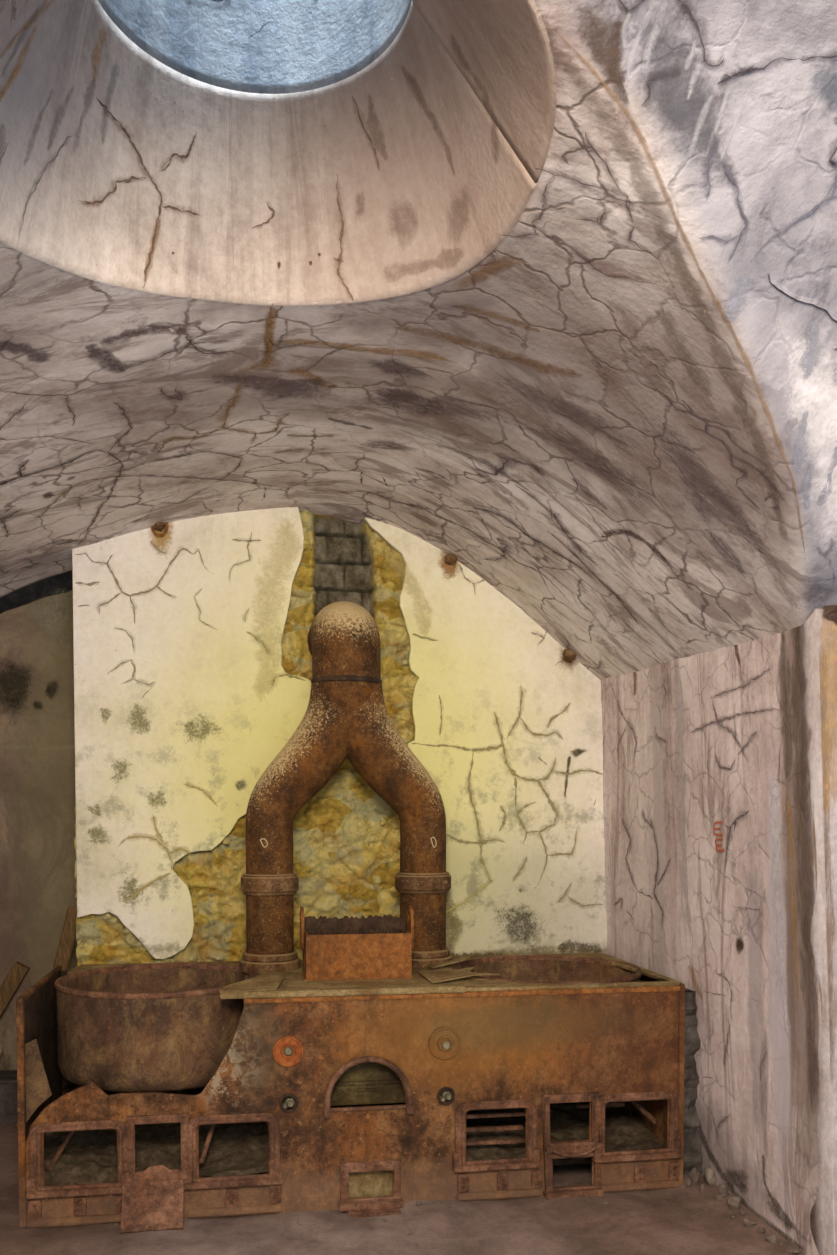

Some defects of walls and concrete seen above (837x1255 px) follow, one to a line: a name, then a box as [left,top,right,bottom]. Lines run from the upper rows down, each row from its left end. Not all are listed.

crack [641,0,837,107]
crack [81,97,200,288]
crack [0,303,334,699]
crack [342,454,673,625]
damp [0,664,57,710]
damp [88,804,108,843]
damp [130,705,150,734]
spalling [74,805,246,966]
damp [177,715,218,743]
spalling [293,758,400,960]
spalling [281,510,418,744]
crack [412,667,780,928]